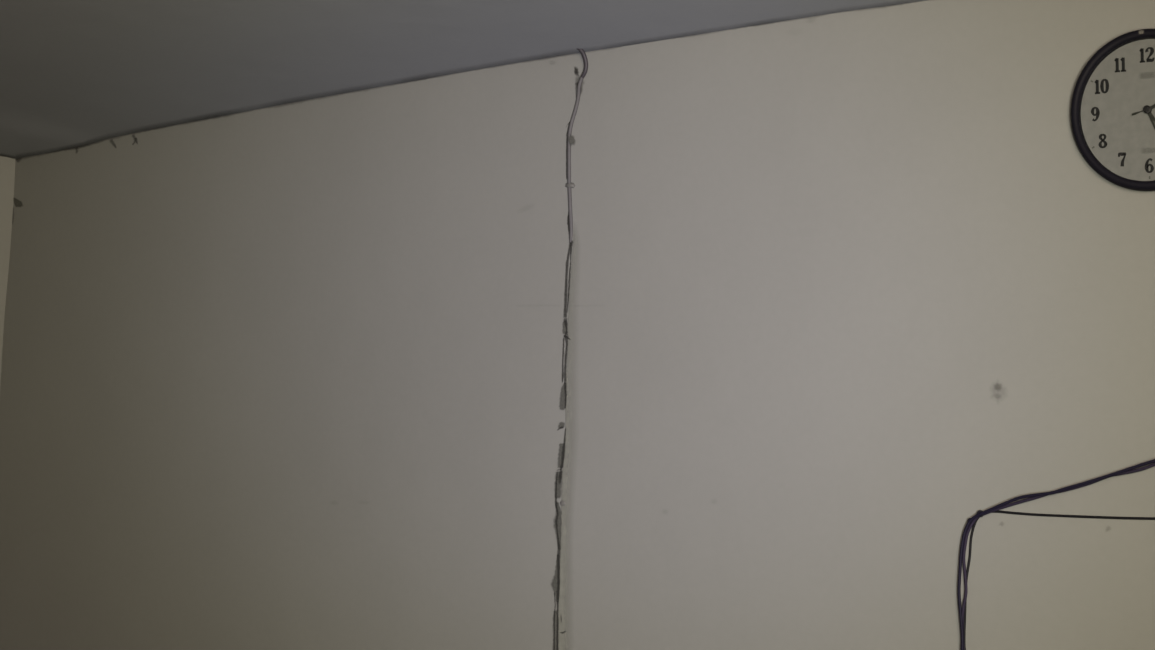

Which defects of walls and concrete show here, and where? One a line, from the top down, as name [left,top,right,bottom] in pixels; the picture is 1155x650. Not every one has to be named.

crack [552,68,581,650]